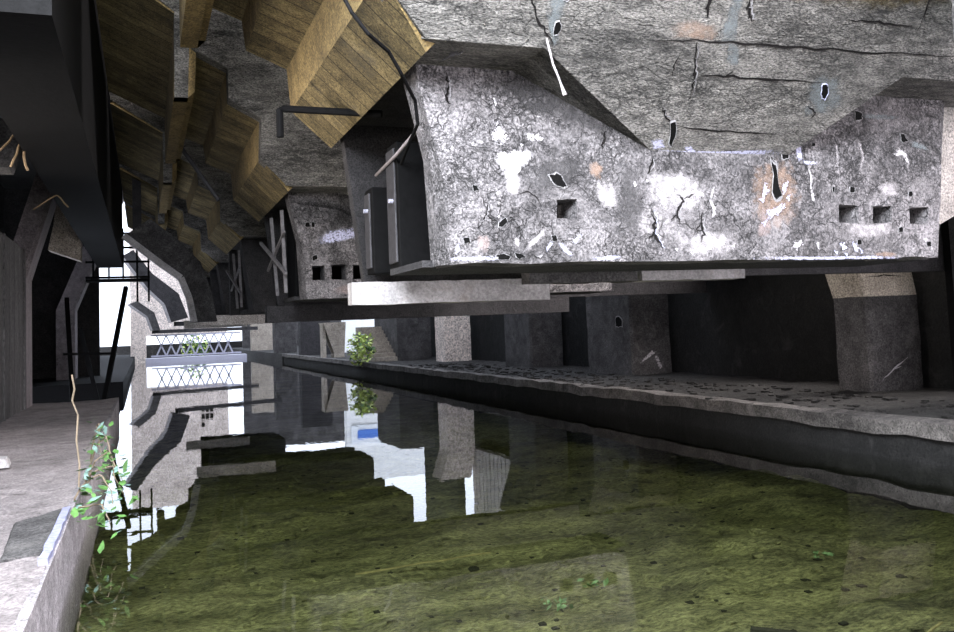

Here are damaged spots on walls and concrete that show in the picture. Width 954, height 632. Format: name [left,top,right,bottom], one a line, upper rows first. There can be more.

crack [531,0,553,43]
crack [649,0,954,99]
peeling [491,121,509,145]
crack [662,107,769,134]
spalling [547,172,568,189]
spalling [759,154,791,227]
crack [649,194,707,249]